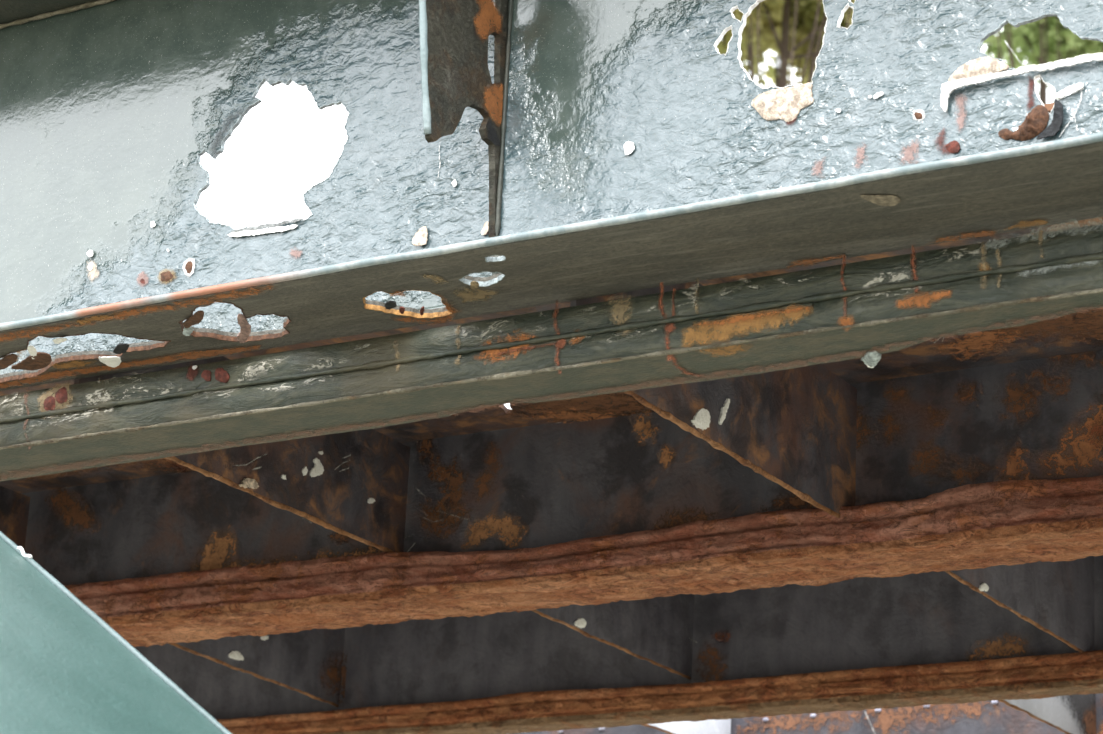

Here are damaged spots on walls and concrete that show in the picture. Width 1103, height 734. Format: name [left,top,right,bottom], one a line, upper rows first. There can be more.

rust [474,0,501,39]
spalling [948,56,1009,81]
spalling [751,82,814,122]
peeling [1056,83,1084,99]
peeling [227,218,304,237]
rust [137,258,195,286]
rust [0,286,271,370]
rust [659,279,810,377]
rust [0,345,261,388]
spalling [187,361,271,396]
rust [31,456,394,571]
rust [736,694,1103,734]